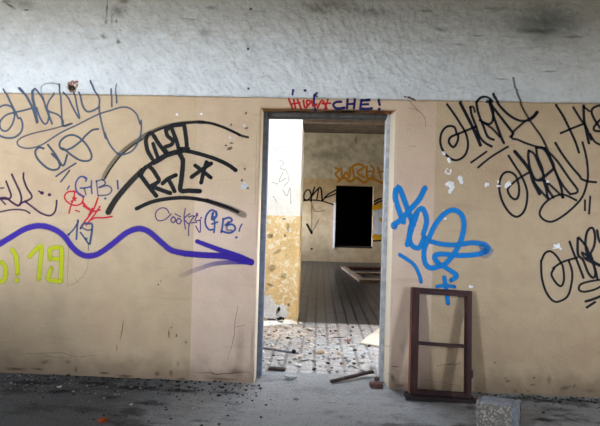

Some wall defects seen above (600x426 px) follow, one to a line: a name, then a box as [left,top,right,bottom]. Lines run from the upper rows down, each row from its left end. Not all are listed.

crack [205,308,244,375]
peeling [264,295,290,321]